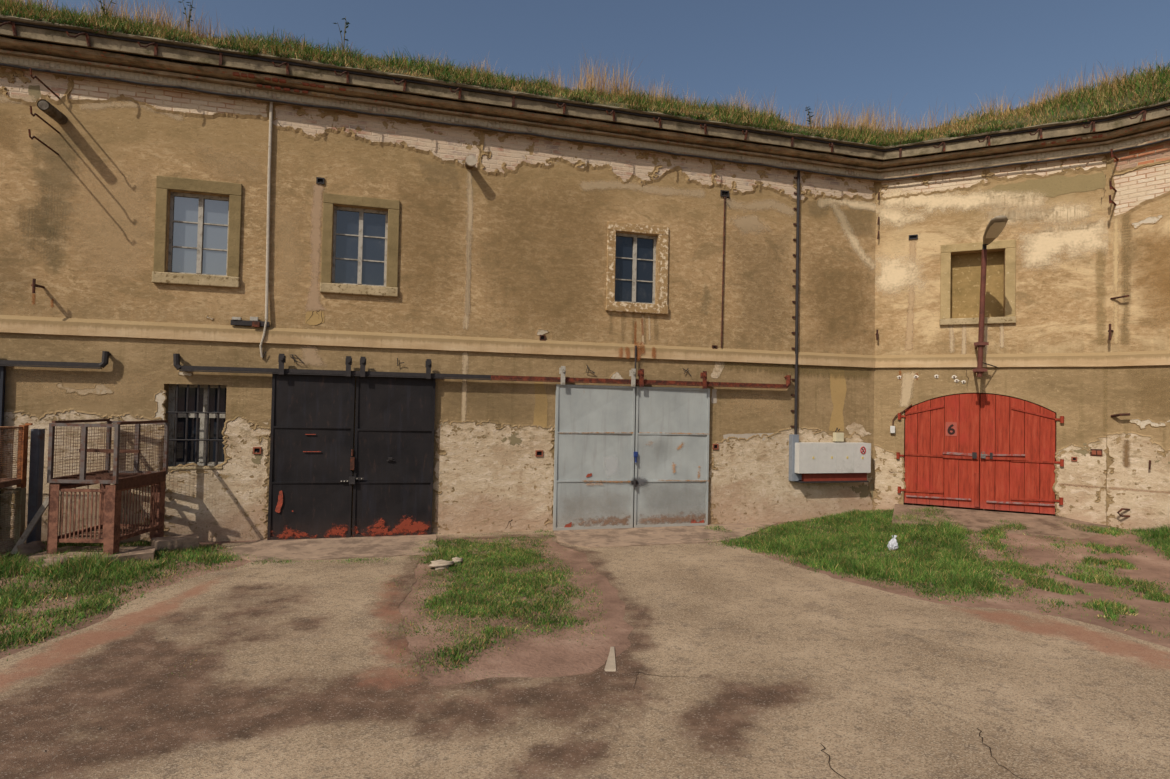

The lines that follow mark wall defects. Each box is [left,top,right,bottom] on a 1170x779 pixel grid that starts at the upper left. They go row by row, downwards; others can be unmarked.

spalling [0,67,1170,229]
peeling [0,382,572,544]
corrosion [571,515,705,526]
peeling [691,422,906,524]
peeling [1052,418,1170,532]